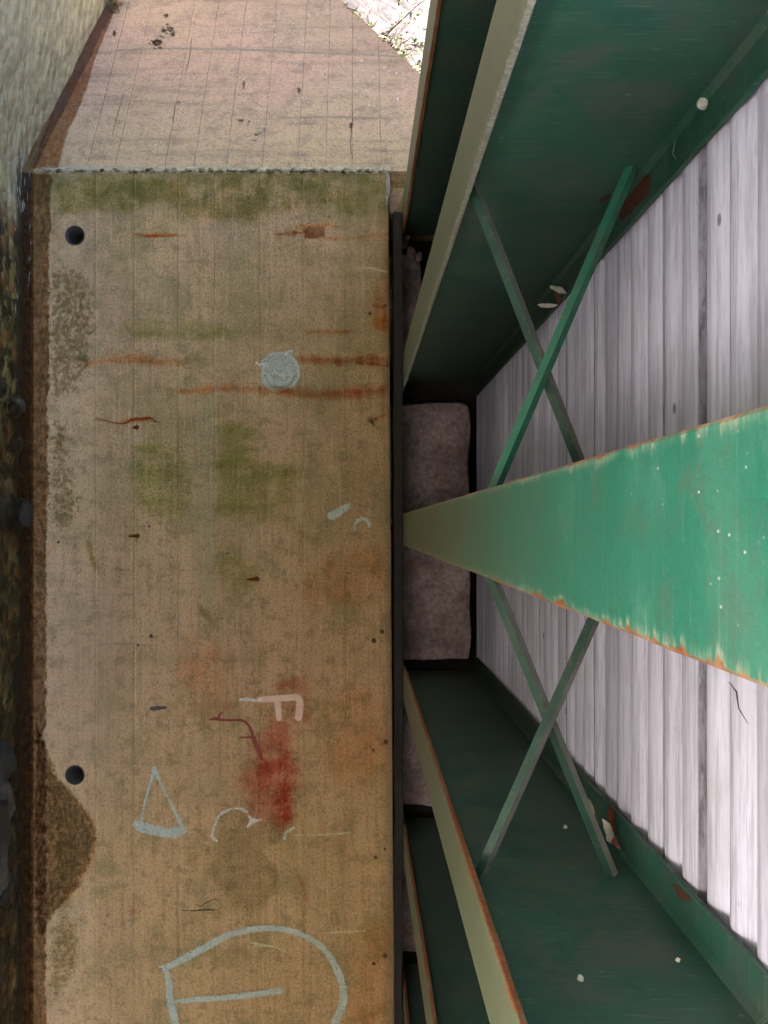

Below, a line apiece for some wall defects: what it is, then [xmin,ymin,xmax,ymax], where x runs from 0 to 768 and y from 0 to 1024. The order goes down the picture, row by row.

damp [19,2,123,1024]